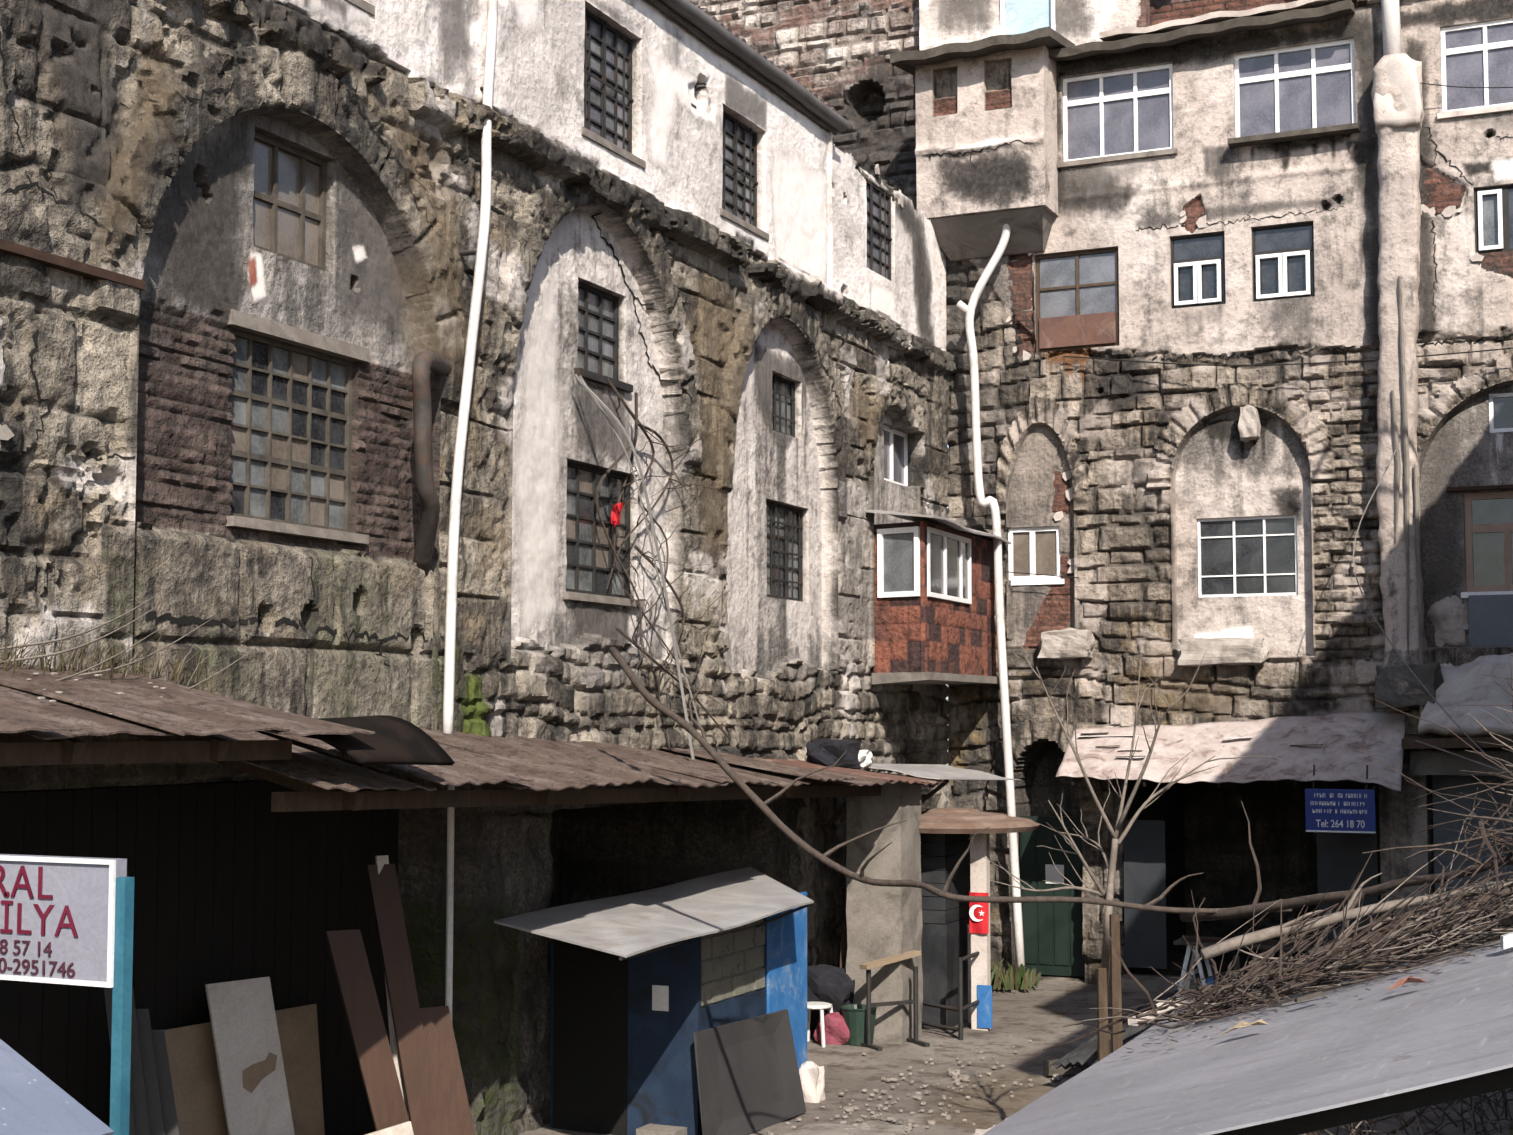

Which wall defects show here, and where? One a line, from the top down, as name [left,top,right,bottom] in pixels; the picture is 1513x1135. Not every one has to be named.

water stain [441,0,478,81]
water stain [819,57,940,352]
water stain [939,151,1031,204]
spalling [1177,193,1206,233]
spalling [1421,166,1466,218]
spalling [1469,251,1513,278]
peeling [0,424,14,449]